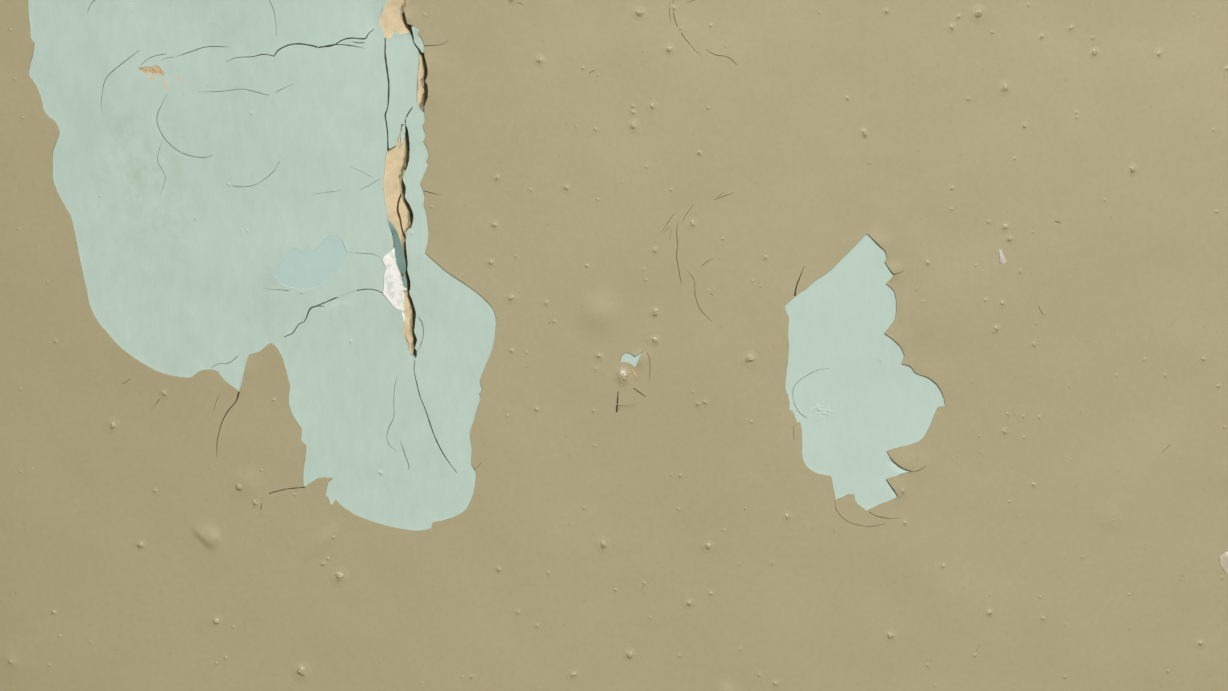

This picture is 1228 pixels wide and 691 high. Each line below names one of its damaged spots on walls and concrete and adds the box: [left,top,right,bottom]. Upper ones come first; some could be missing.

crack [157,93,212,195]
crack [101,0,413,151]
peeling [28,0,496,531]
crack [284,289,383,337]
peeling [785,234,945,511]